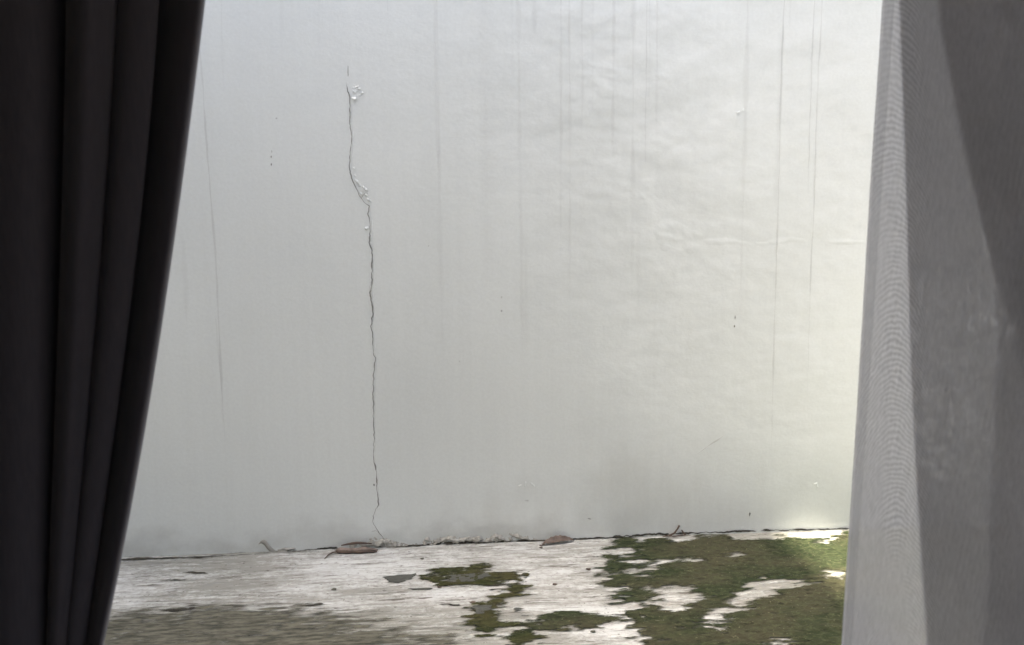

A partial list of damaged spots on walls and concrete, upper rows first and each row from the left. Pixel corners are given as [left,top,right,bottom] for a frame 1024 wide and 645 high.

crack [347,88,545,548]
crack [573,528,849,540]
crack [287,545,337,553]
crack [121,552,245,581]